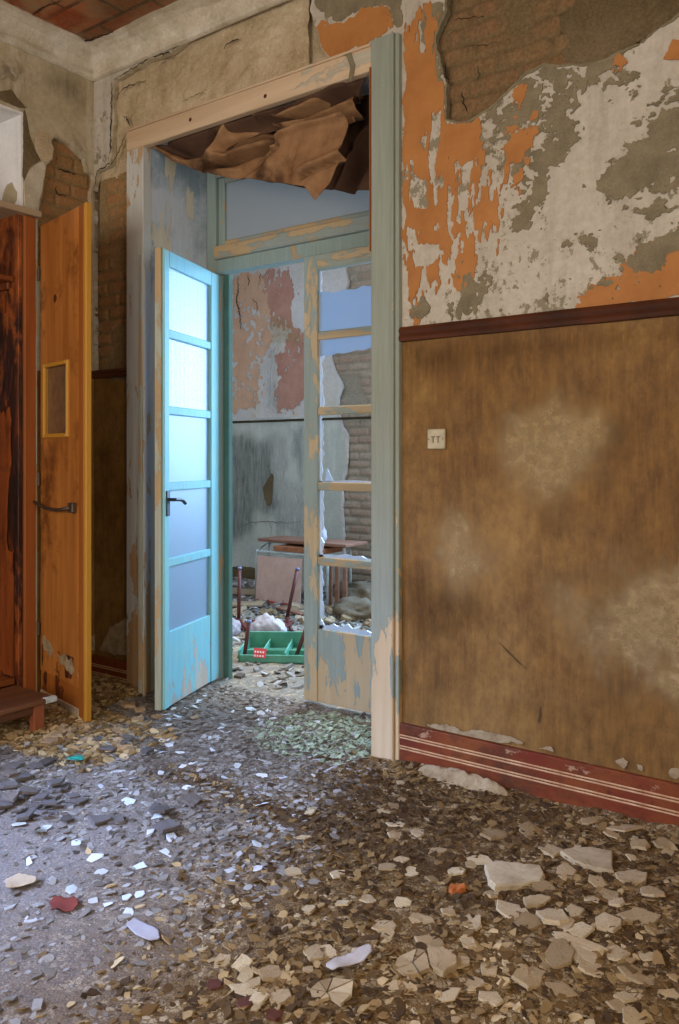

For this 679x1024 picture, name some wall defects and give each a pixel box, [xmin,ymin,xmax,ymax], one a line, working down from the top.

spalling [0,0,679,371]
peeling [232,267,304,417]
spalling [330,348,371,583]
peeling [427,723,524,745]